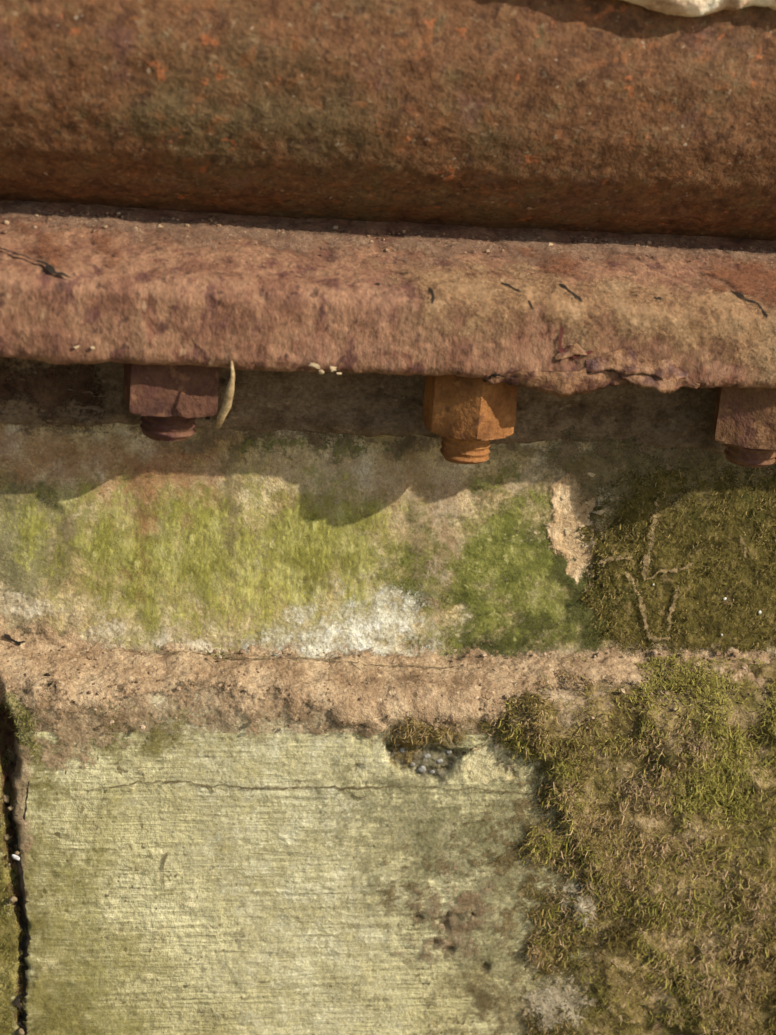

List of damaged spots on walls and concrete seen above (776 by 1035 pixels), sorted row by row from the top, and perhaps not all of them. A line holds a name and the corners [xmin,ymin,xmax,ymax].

crack [0,248,71,278]
leakage [0,588,229,654]
leakage [242,535,442,661]
crack [96,780,545,802]
crack [0,688,34,1035]